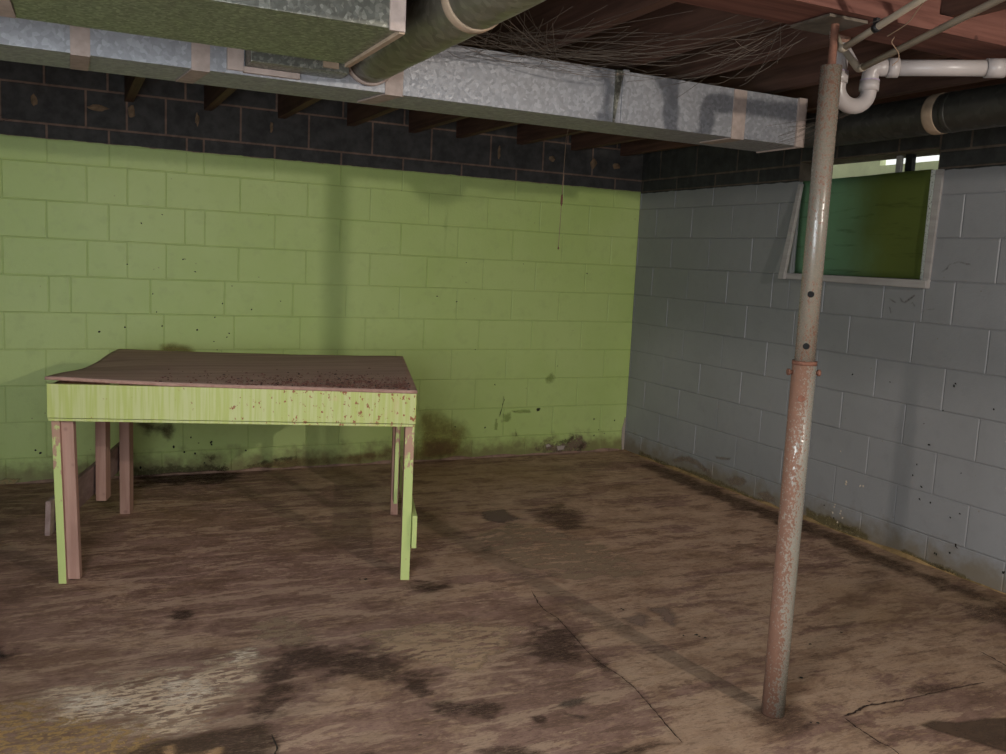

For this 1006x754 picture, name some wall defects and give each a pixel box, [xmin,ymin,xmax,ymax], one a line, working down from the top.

damp [639,451,779,524]
damp [802,508,1006,623]
damp [135,725,274,754]
damp [255,645,501,719]
crack [845,682,984,754]